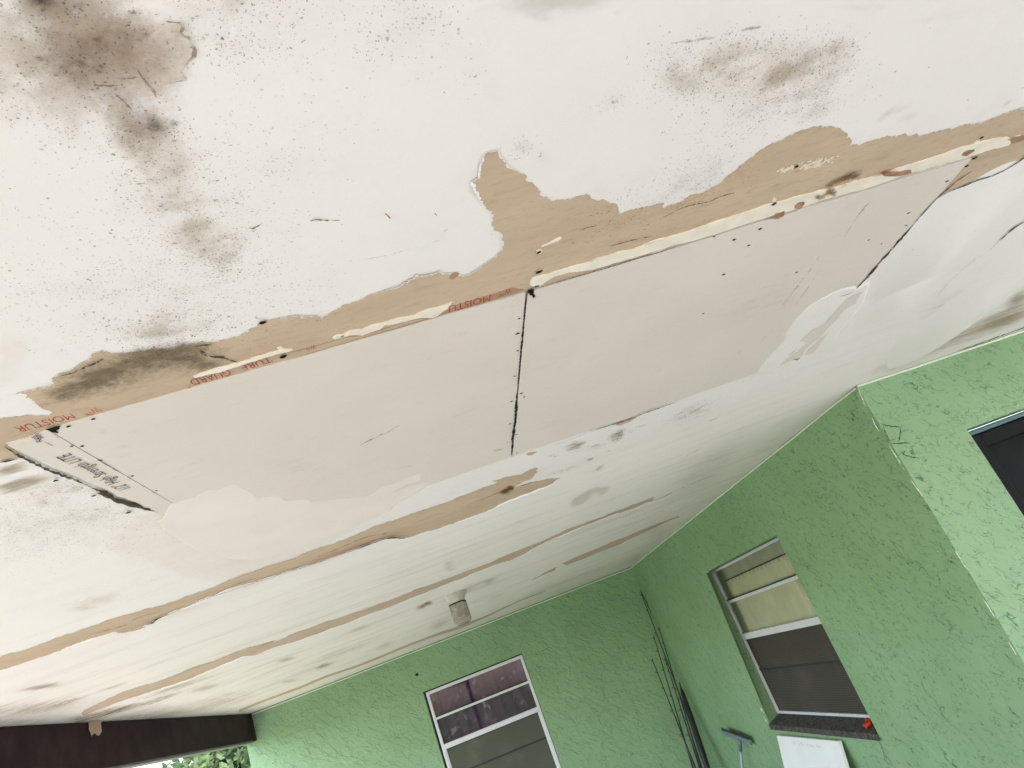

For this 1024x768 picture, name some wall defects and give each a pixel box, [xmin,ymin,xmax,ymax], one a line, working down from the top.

leakage [57,57,157,135]
leakage [166,8,230,70]
leakage [649,26,853,125]
leakage [103,228,246,363]
peeling [0,108,1024,463]
peeling [0,468,560,671]
peeling [81,492,679,736]